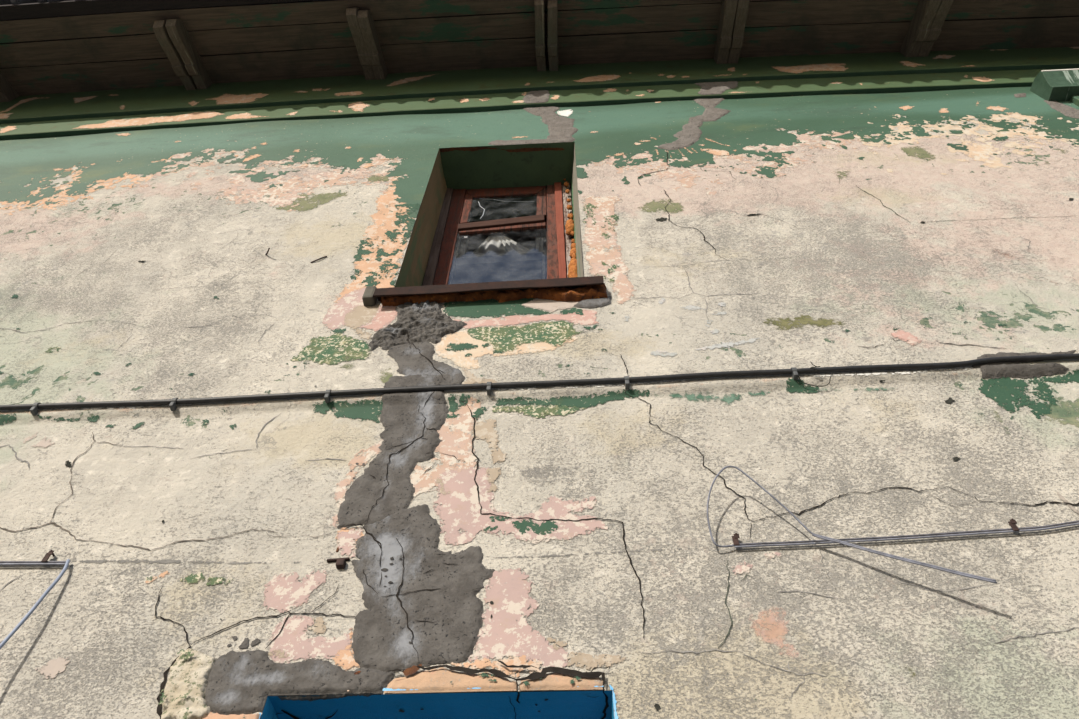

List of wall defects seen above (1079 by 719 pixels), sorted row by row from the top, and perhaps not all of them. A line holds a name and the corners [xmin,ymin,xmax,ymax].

peeling [73,93,268,136]
peeling [588,103,1079,196]
peeling [0,140,420,339]
crack [637,150,804,321]
peeling [331,439,383,558]
crack [0,305,824,719]
peeling [410,299,608,546]
crack [620,354,1079,538]
peeling [263,570,360,670]
peeling [451,568,625,685]
crack [778,551,838,599]
crack [985,627,1079,645]